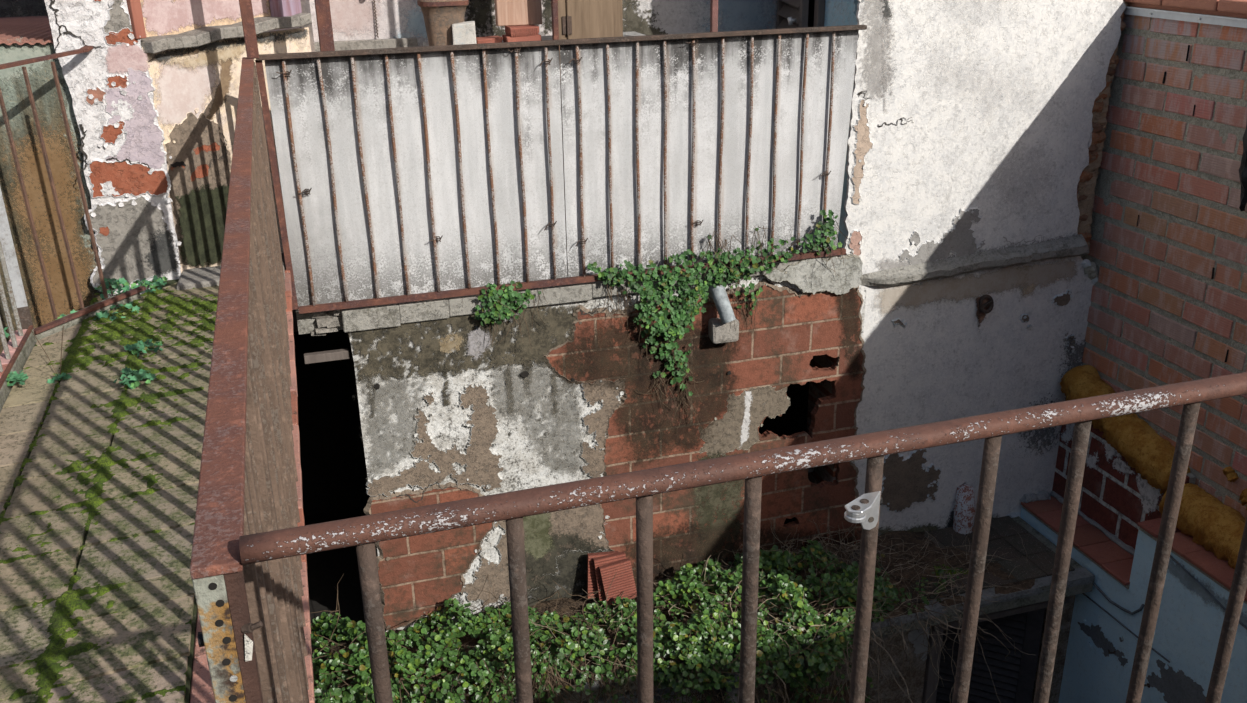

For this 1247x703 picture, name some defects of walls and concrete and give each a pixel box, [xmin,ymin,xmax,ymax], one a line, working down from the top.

leakage [398,2,427,38]
leakage [465,0,506,37]
peeling [84,0,269,295]
peeling [849,98,873,205]
leakage [141,183,229,276]
peeling [898,207,989,265]
flaking render [544,229,867,478]
peeling [363,382,504,515]
flaking render [375,520,510,630]
peeling [524,498,637,605]
flaking render [760,461,862,553]
peeling [881,448,941,512]